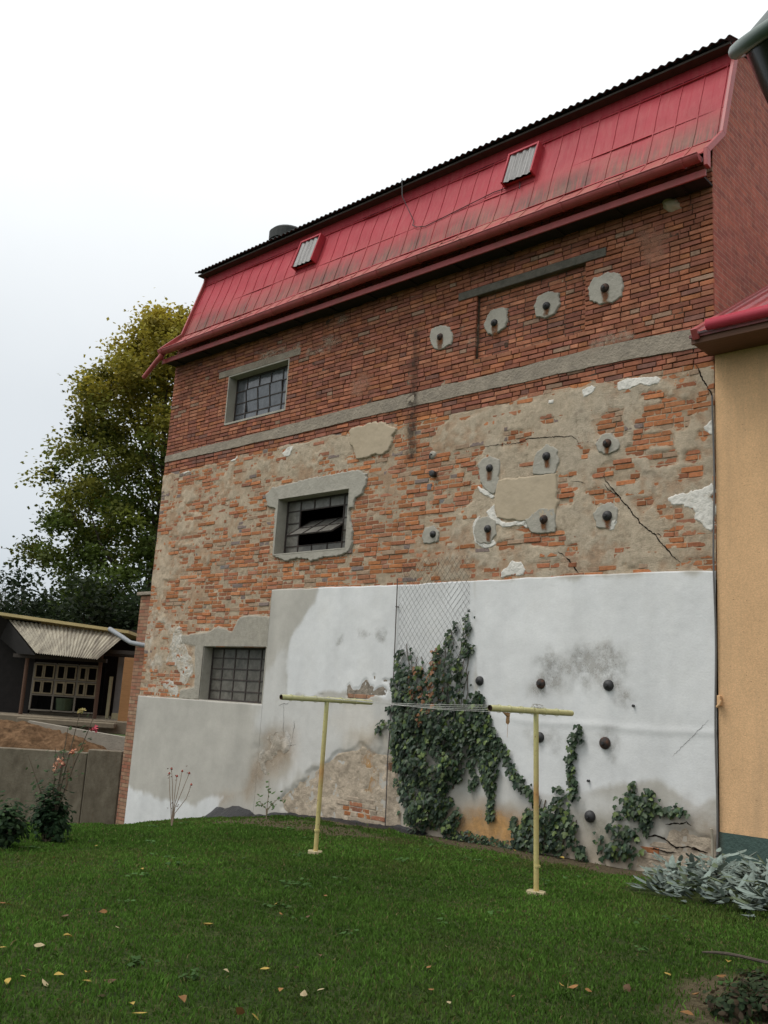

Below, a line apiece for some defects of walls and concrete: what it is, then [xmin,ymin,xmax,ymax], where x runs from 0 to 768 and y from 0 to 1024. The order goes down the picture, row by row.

crack [480,436,579,448]
peeling [558,369,717,543]
spalling [157,500,209,587]
spalling [472,486,578,578]
crack [572,476,681,563]
peeling [155,622,194,697]
spalling [347,676,395,699]
spalling [281,746,401,826]
crack [648,821,707,853]